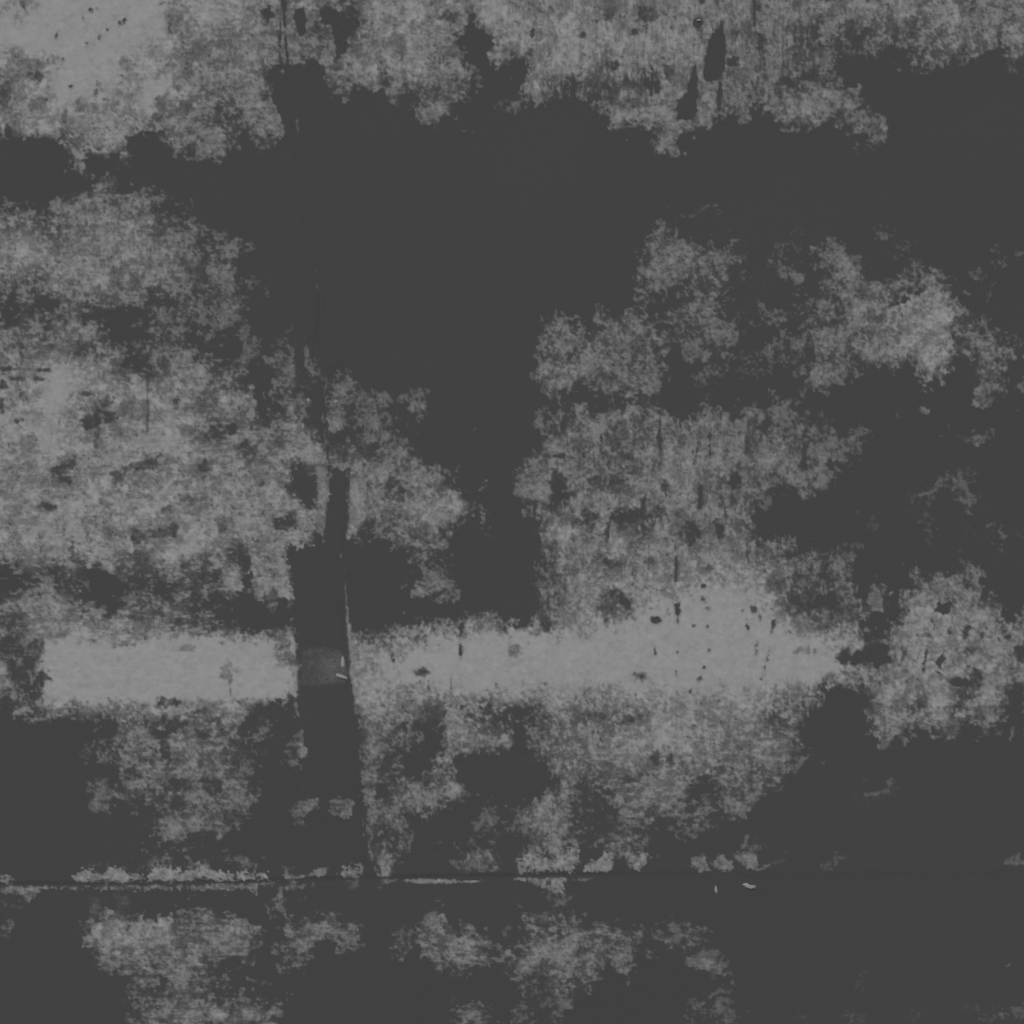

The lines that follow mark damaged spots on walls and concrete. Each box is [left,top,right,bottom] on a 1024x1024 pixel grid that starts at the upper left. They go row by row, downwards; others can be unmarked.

damp [0,0,1024,669]
damp [0,439,365,883]
damp [354,703,564,878]
crack [0,466,1024,931]
damp [563,681,1024,875]
damp [951,671,983,710]
damp [0,872,1024,1024]